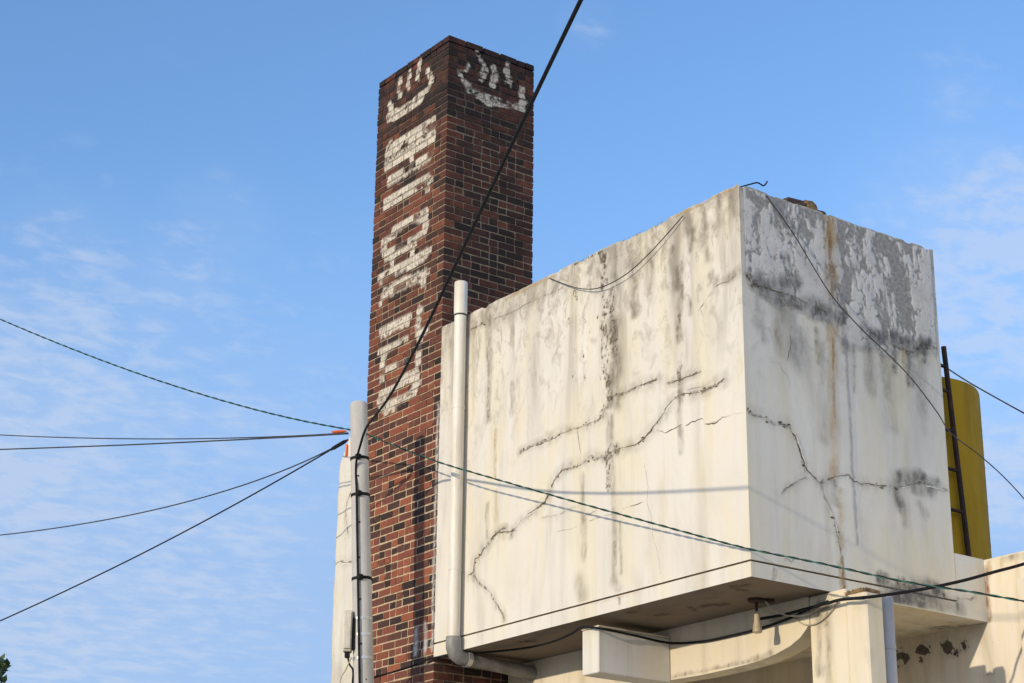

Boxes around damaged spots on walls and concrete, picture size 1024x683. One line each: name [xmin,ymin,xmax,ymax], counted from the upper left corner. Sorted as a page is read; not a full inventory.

damp [597,252,620,410]
damp [869,330,931,385]
crack [469,372,947,618]
spalling [896,640,969,668]